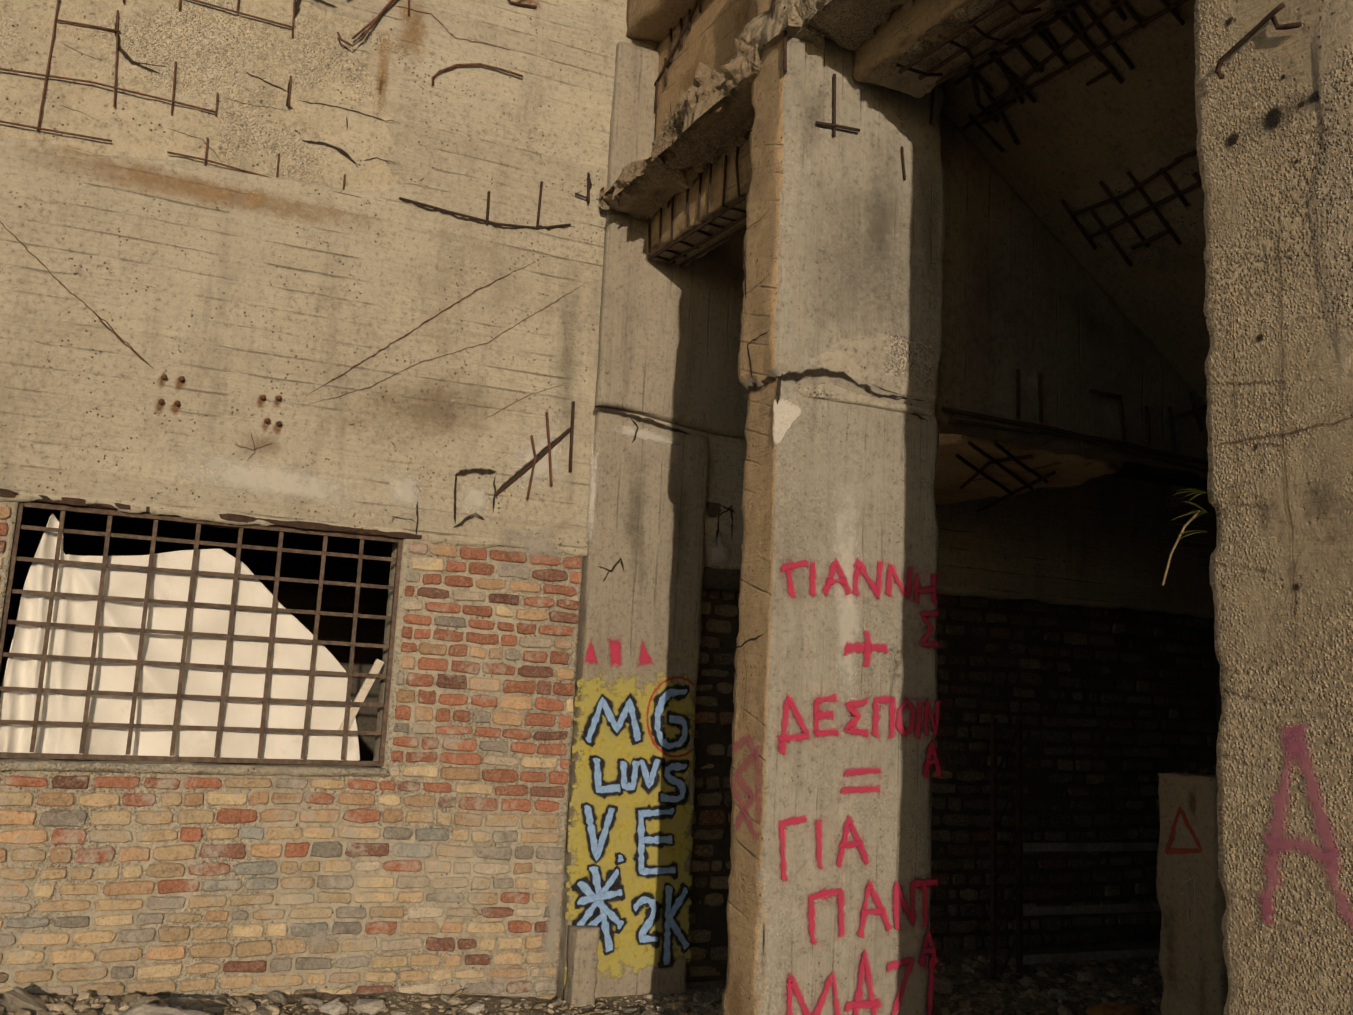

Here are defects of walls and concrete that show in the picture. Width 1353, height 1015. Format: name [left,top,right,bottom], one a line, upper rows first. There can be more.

spalling [654,0,702,112]
spalling [863,0,1188,152]
spalling [648,146,748,267]
spalling [1059,134,1206,273]
crack [0,222,150,365]
crack [299,262,585,408]
crack [737,211,937,422]